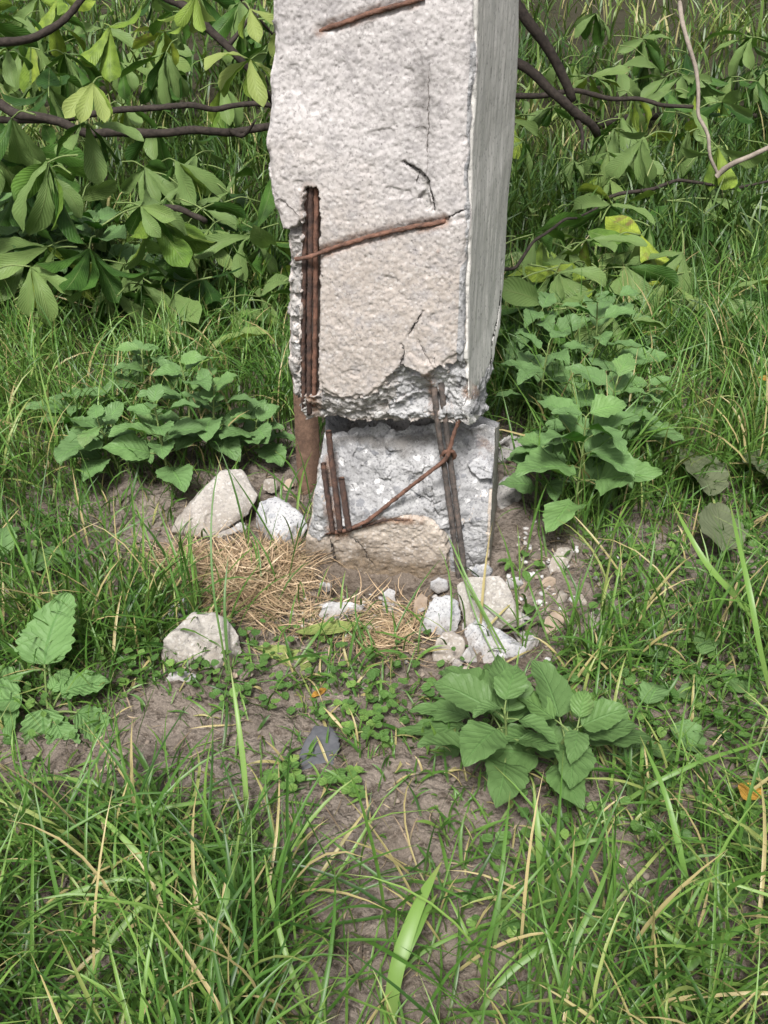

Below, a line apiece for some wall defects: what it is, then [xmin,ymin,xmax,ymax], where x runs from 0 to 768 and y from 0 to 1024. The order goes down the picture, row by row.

crack [404,66,464,220]
spalling [289,41,494,579]
crack [400,313,435,366]